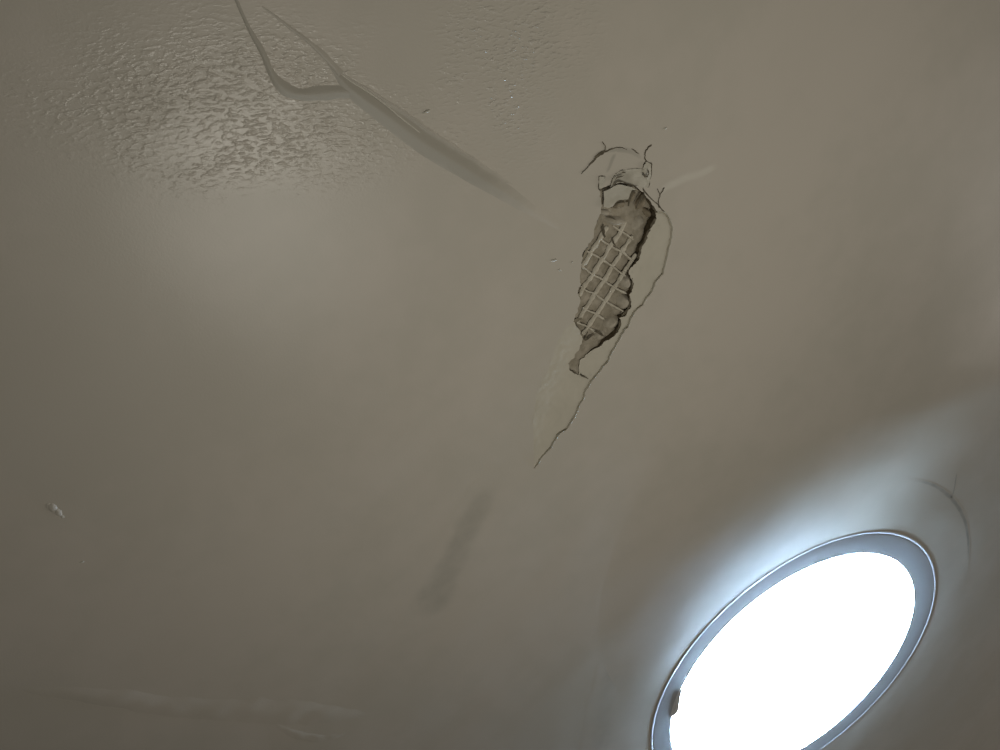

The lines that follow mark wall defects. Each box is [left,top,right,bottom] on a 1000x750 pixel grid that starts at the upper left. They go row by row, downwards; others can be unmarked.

flaking render [533,162,674,468]